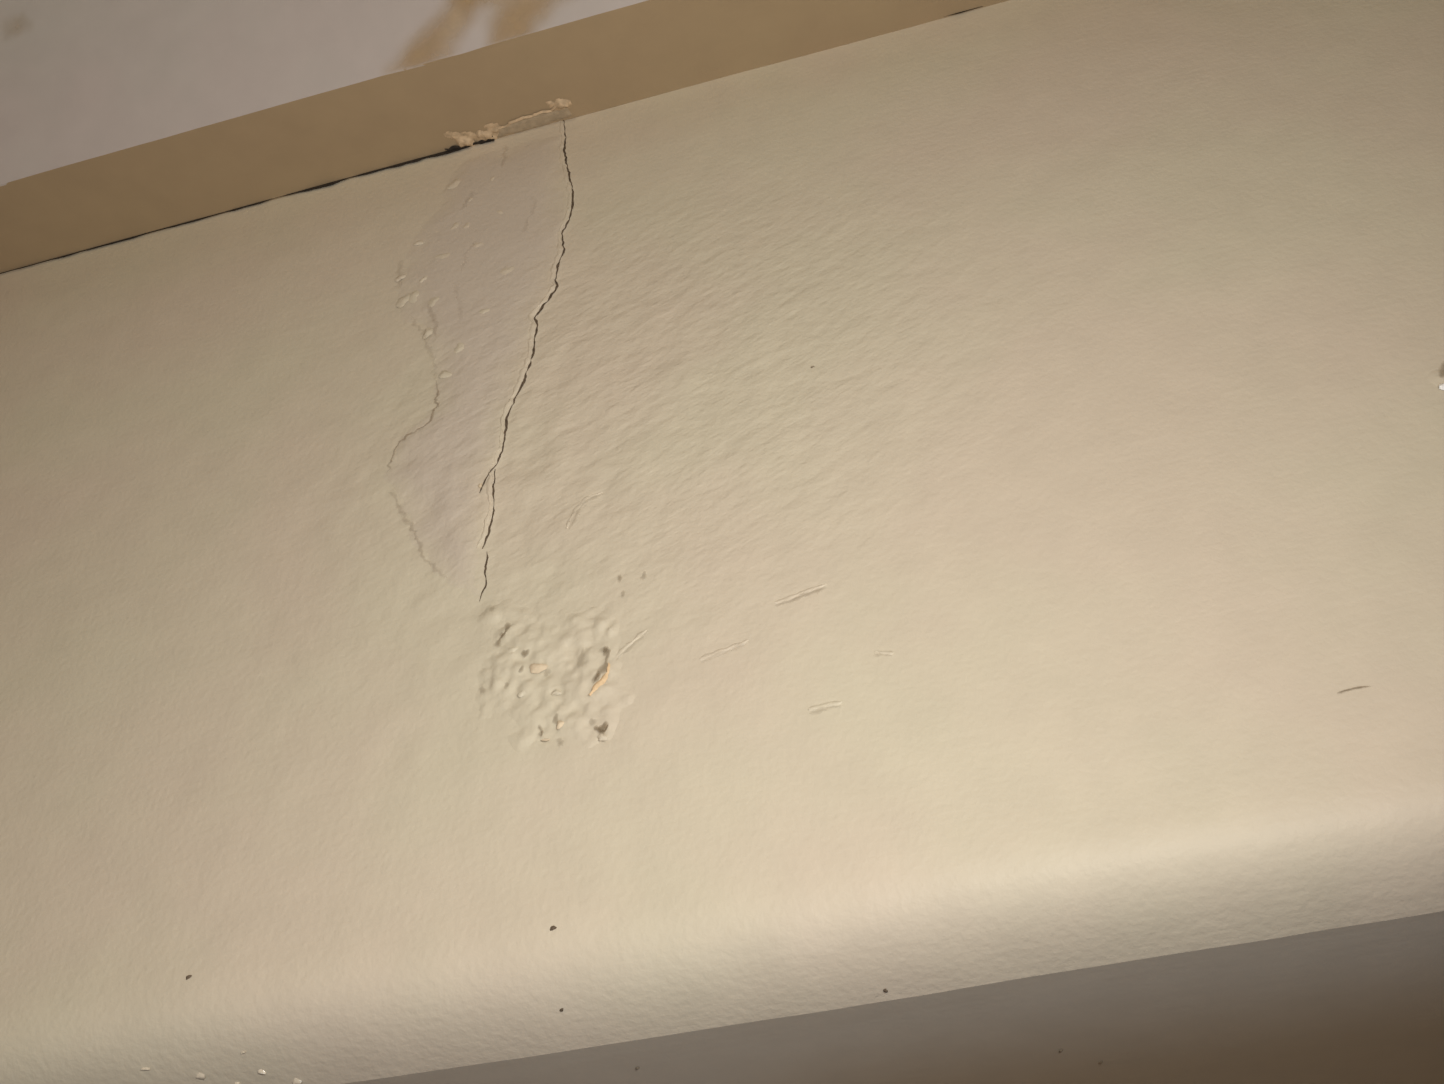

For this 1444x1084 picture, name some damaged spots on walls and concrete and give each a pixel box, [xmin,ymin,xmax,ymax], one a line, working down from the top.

crack [477,120,574,601]